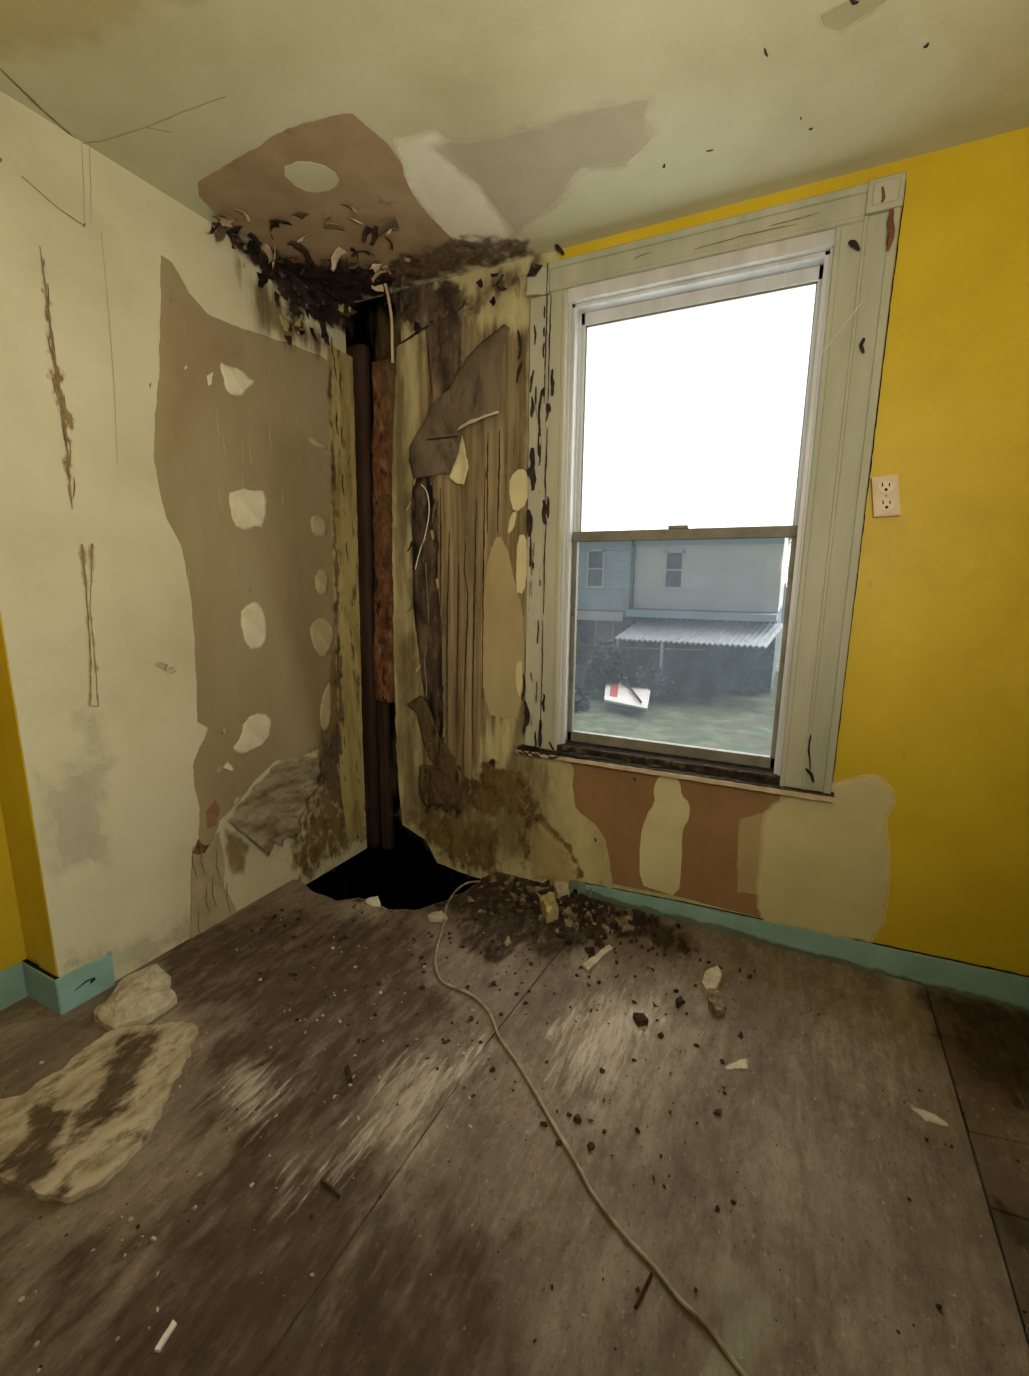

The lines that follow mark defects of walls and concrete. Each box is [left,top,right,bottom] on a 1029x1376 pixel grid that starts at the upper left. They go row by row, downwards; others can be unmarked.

peeling [881,186,895,252]
peeling [153,113,485,855]
spalling [306,703,481,910]
damp [207,102,698,963]
peeling [516,244,670,767]
peeling [805,734,815,783]